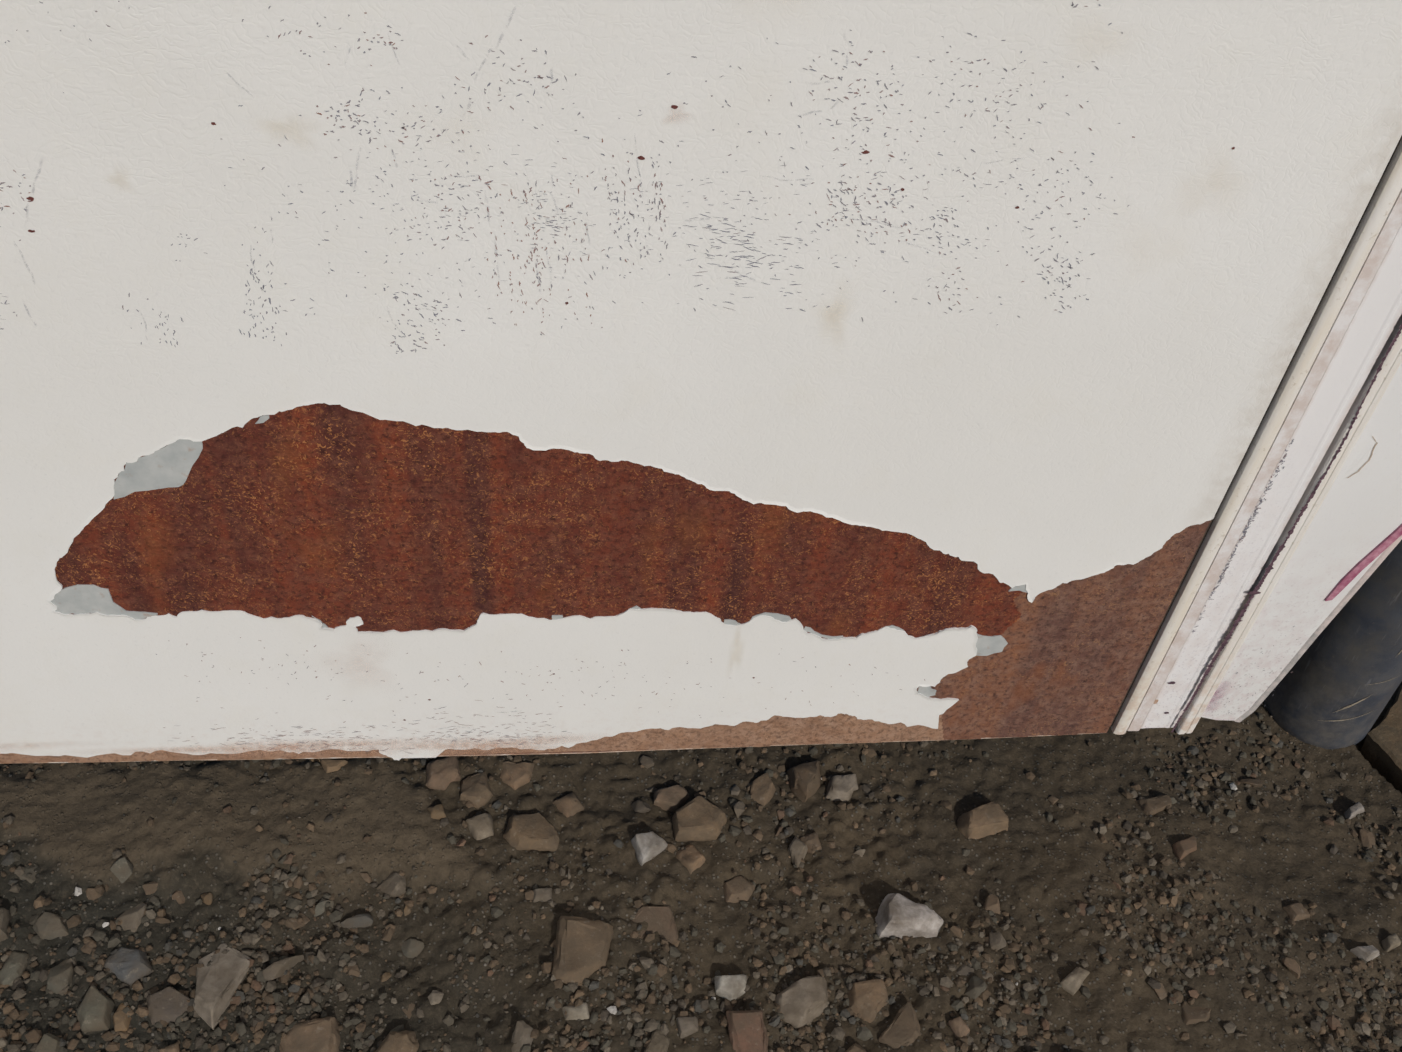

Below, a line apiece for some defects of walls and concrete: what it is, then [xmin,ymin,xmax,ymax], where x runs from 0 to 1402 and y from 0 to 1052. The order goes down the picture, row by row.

peeling [46,400,1215,715]
corrosion [51,403,1211,755]
corrosion [0,746,386,764]